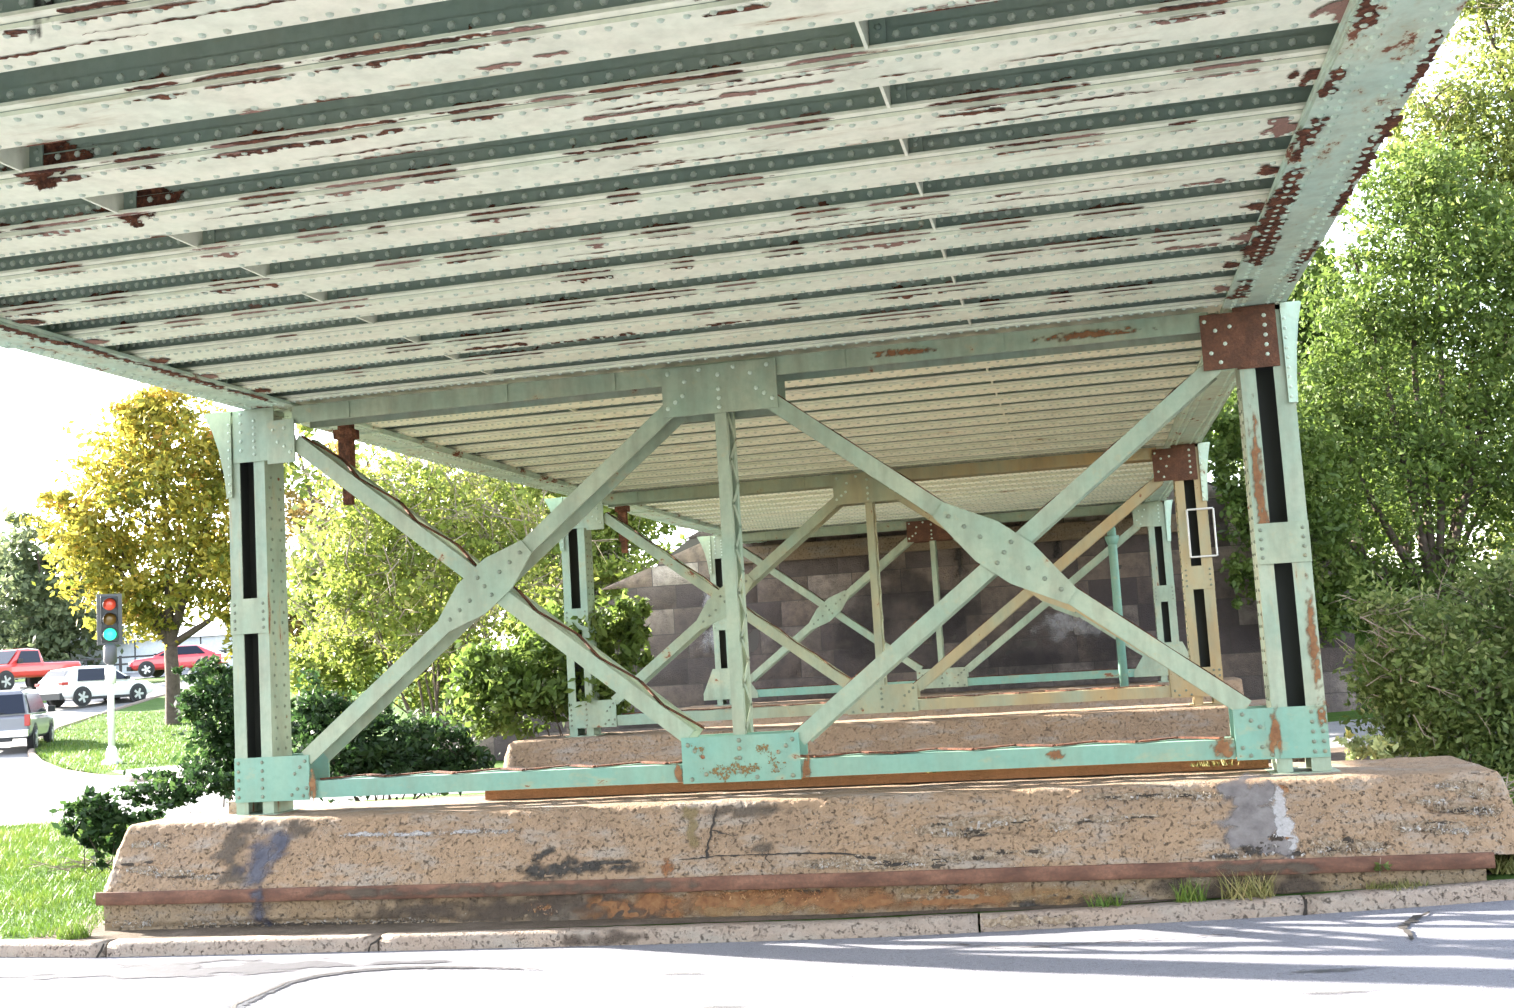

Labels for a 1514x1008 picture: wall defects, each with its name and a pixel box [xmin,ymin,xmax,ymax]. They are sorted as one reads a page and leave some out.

rust [0,0,296,60]
rust [125,22,573,101]
rust [0,44,938,243]
rust [1001,0,1231,63]
rust [925,55,1346,131]
rust [1309,0,1380,30]
rust [1327,29,1444,218]
rust [373,202,553,272]
rust [712,117,1330,300]
rust [0,290,271,402]
water stain [212,817,312,927]
water stain [315,847,675,945]